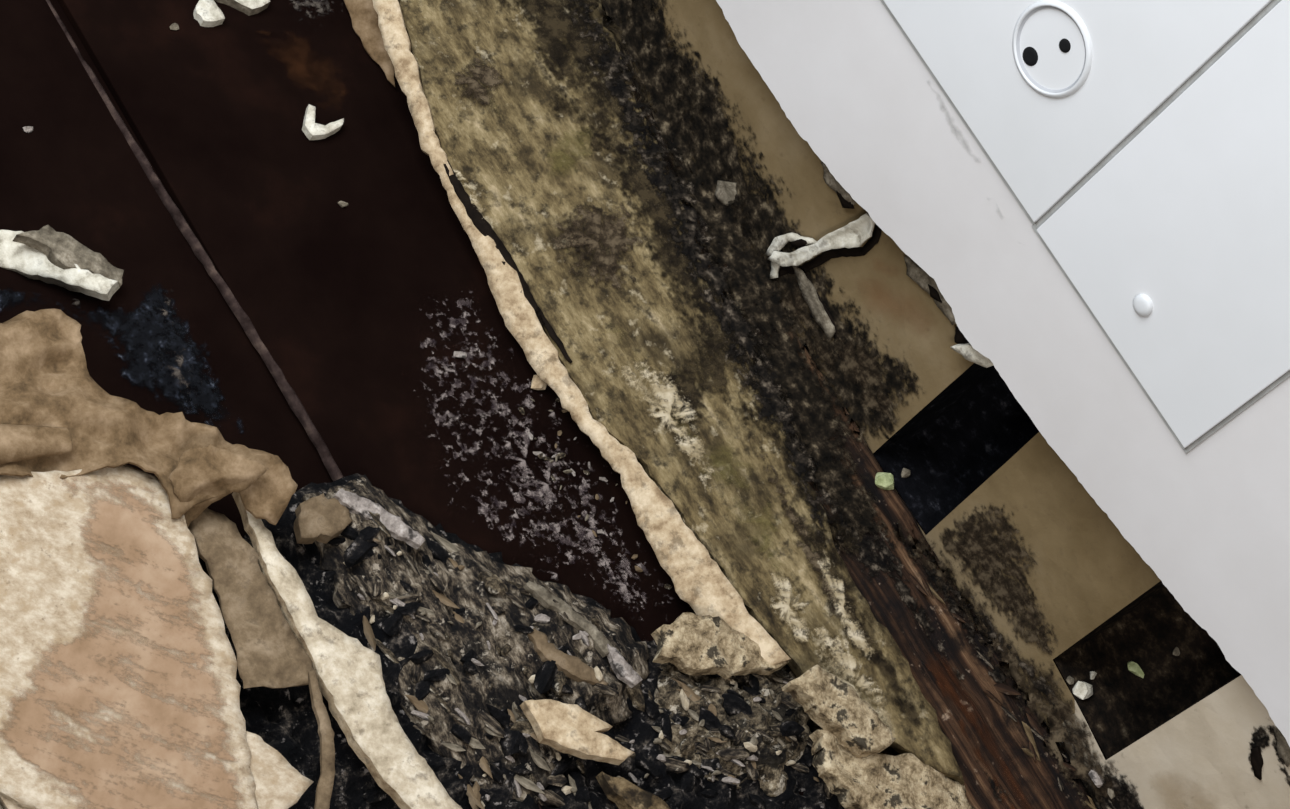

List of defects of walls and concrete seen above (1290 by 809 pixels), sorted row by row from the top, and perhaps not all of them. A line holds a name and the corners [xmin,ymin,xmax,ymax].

damp [450,58,504,106]
peeling [765,162,875,341]
spalling [904,256,993,368]
damp [414,291,673,611]
damp [499,0,1144,809]
spalling [1248,726,1290,786]